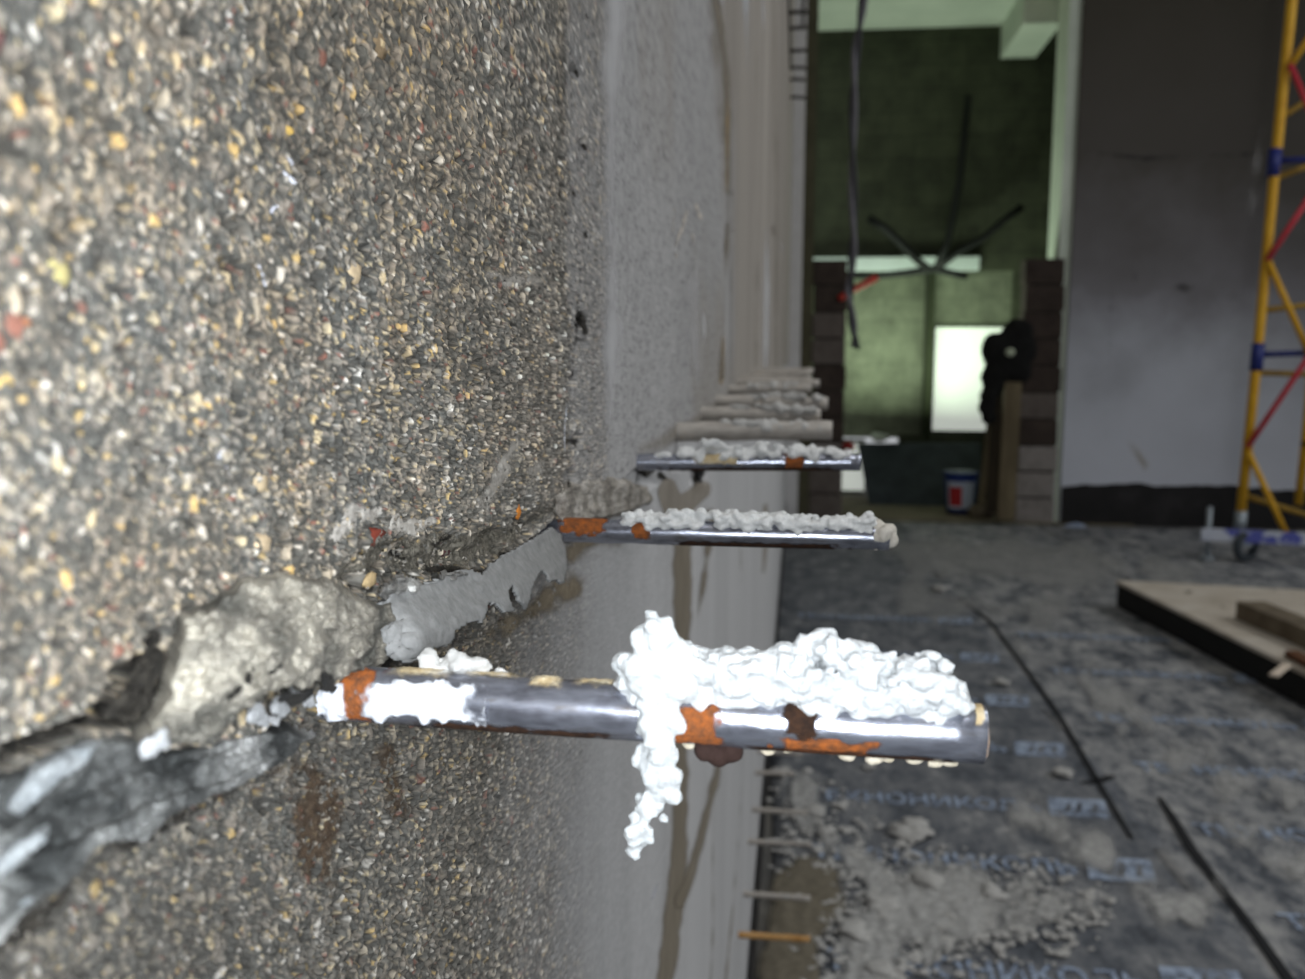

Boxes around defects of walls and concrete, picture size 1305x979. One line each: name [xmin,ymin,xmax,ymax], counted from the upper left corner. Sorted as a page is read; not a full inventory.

damp [673,545,712,641]
crack [0,630,164,764]
damp [657,743,720,979]